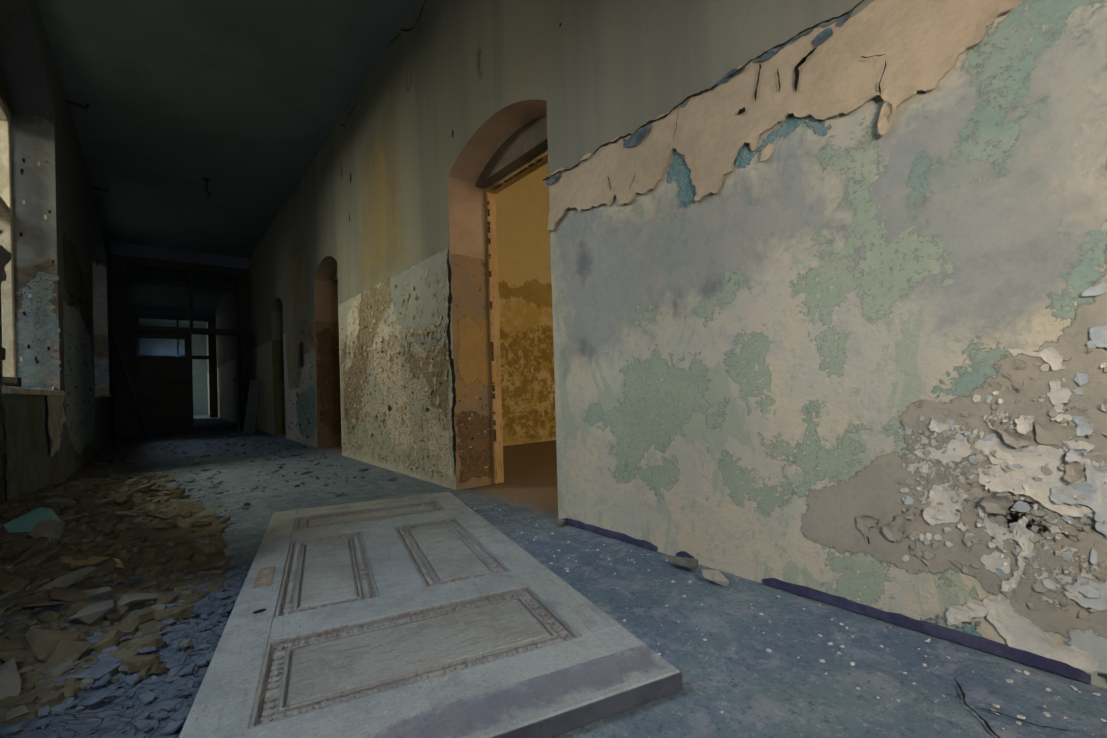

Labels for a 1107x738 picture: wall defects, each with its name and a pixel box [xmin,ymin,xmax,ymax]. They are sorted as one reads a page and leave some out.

peeling [0,230,94,457]
peeling [285,248,493,483]
peeling [498,279,552,309]
peeling [706,221,1107,674]
crack [954,678,1079,738]